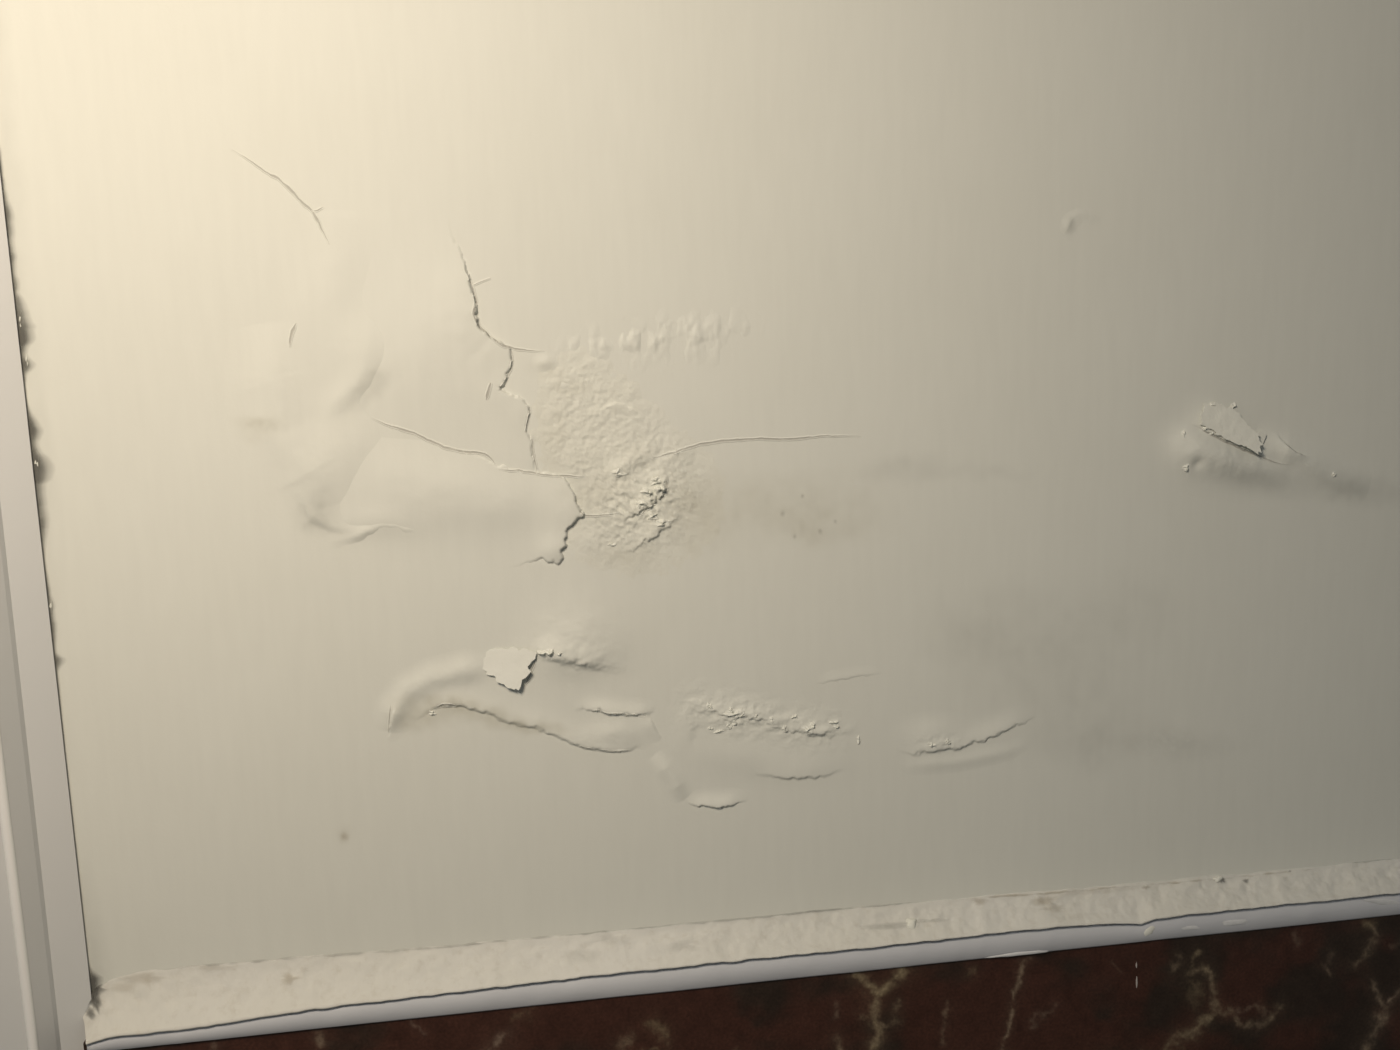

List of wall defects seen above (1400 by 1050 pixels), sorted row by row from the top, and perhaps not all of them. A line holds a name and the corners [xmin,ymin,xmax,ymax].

crack [231,149,331,245]
crack [370,265,585,479]
crack [645,434,861,462]